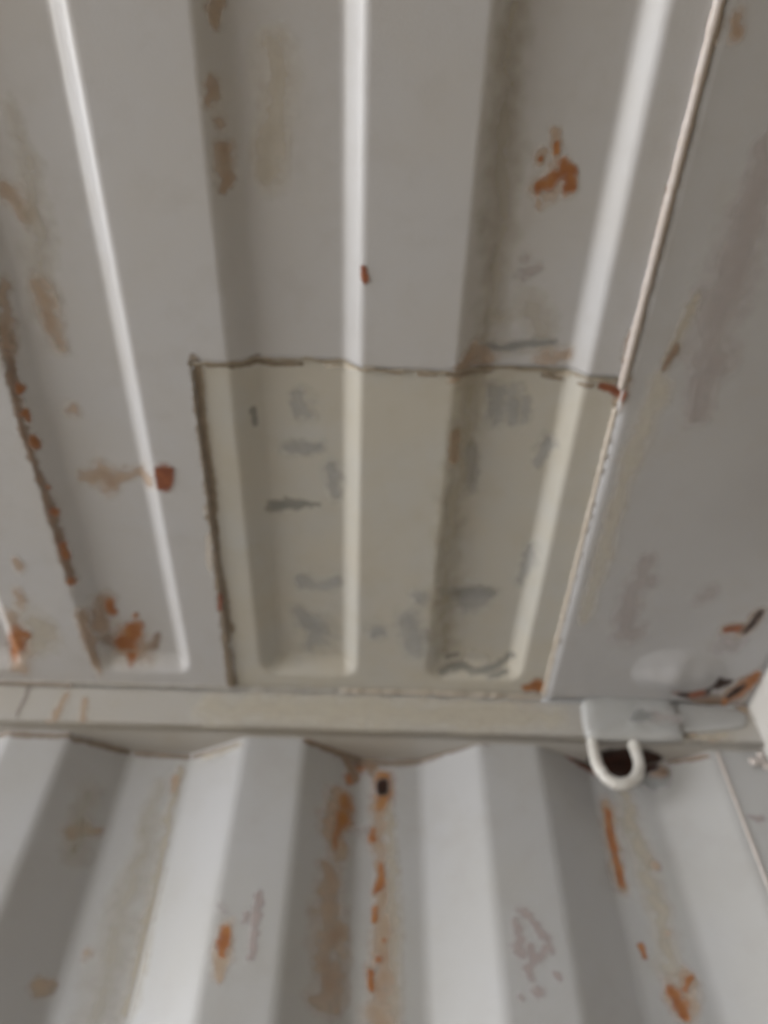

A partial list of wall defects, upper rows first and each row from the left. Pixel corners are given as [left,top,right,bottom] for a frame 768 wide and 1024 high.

corrosion [530,127,578,208]
corrosion [360,265,369,284]
corrosion [0,280,77,586]
corrosion [78,464,174,492]
corrosion [0,590,238,805]
corrosion [303,738,482,1024]
corrosion [601,800,627,893]
corrosion [213,906,232,983]
corrosion [665,969,700,1022]